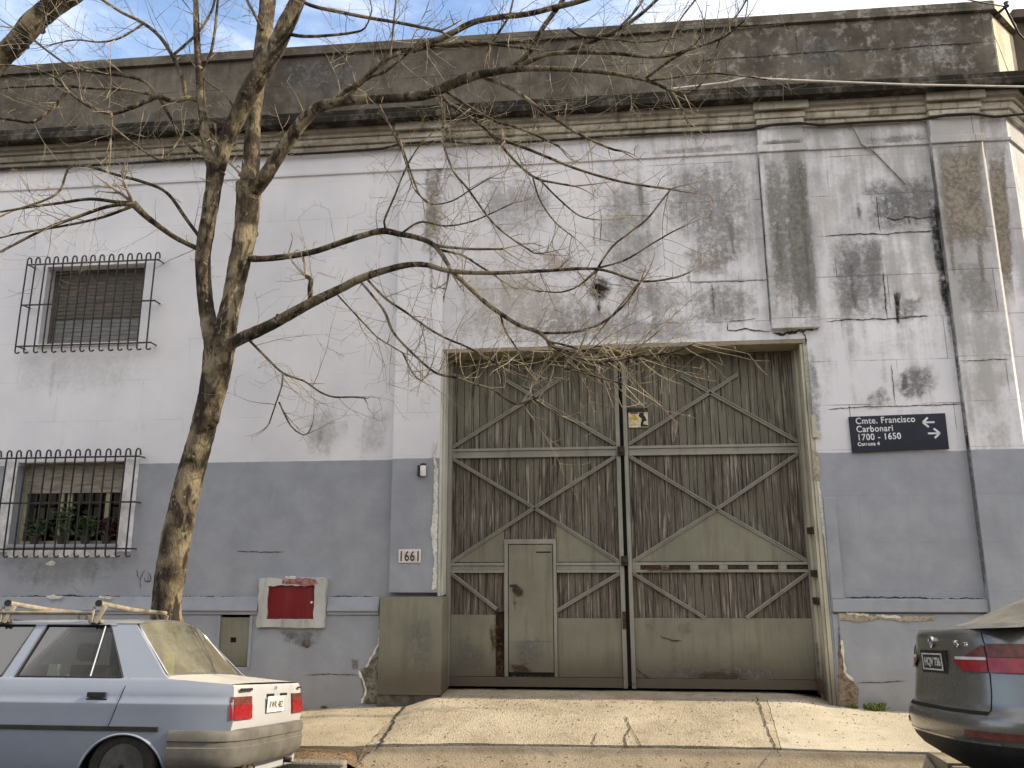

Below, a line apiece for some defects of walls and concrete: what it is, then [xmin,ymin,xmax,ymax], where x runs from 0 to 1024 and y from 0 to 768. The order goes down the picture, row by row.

water stain [671,173,746,272]
water stain [758,158,816,319]
crack [828,196,934,236]
crack [691,273,925,344]
water stain [840,245,881,308]
water stain [869,147,1012,582]
peeling [282,576,318,586]
spalling [358,631,379,704]
rust [490,618,529,675]
spalling [838,612,935,707]